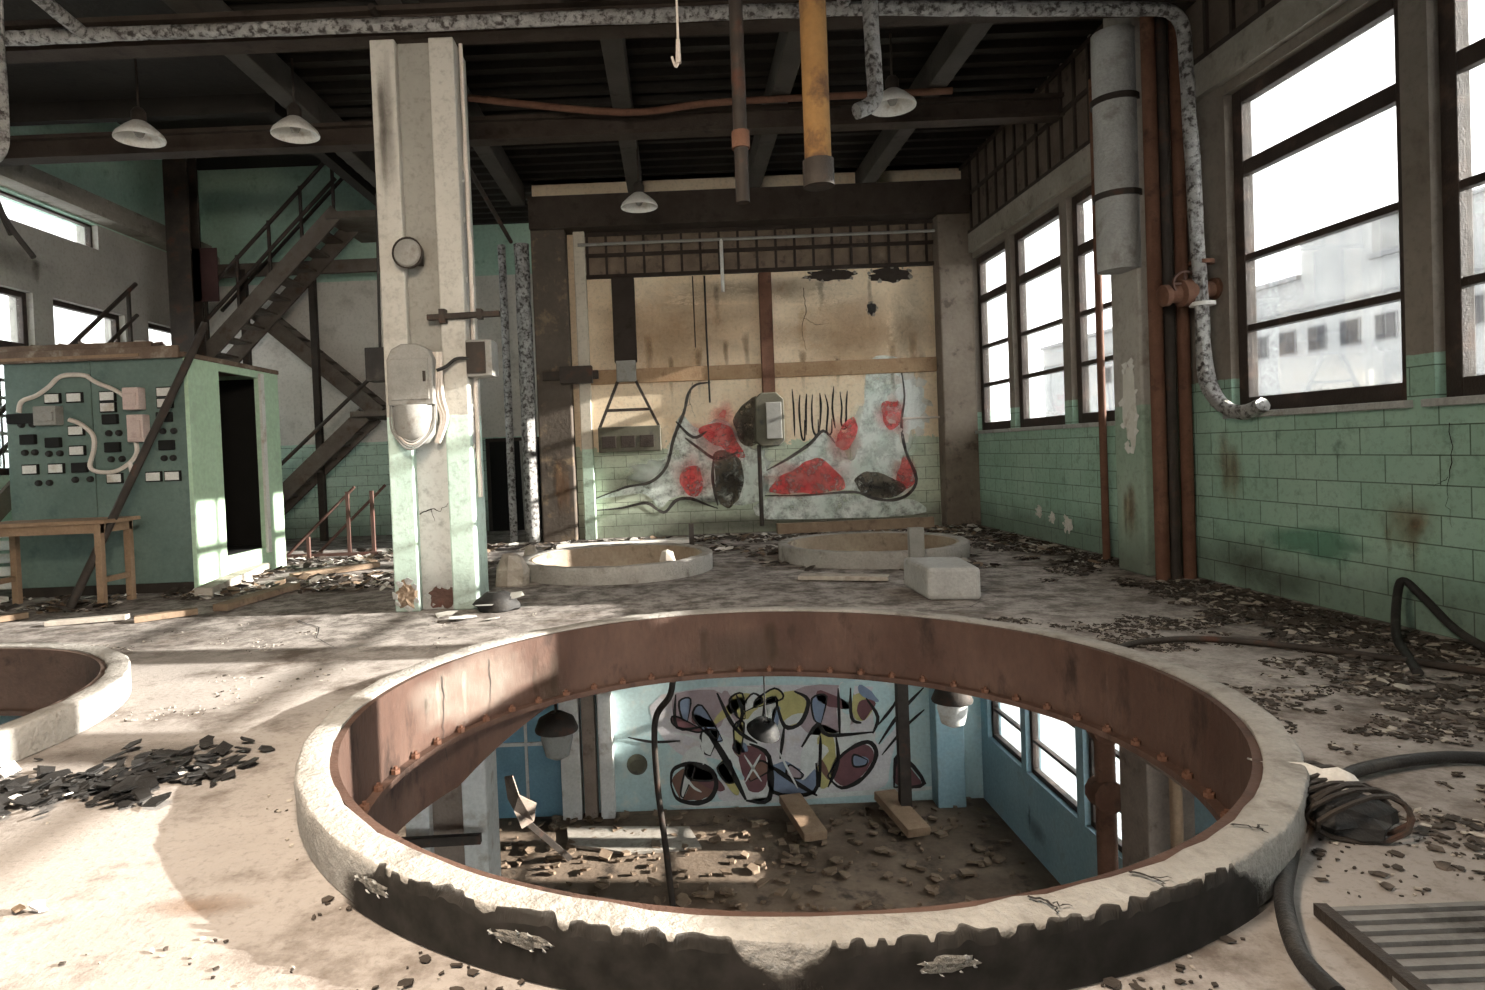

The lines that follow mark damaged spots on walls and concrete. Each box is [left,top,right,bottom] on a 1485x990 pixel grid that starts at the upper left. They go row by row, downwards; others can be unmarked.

spalling [487,928,555,953]
peeling [397,951,525,990]
spalling [917,954,981,977]
peeling [1101,954,1219,990]